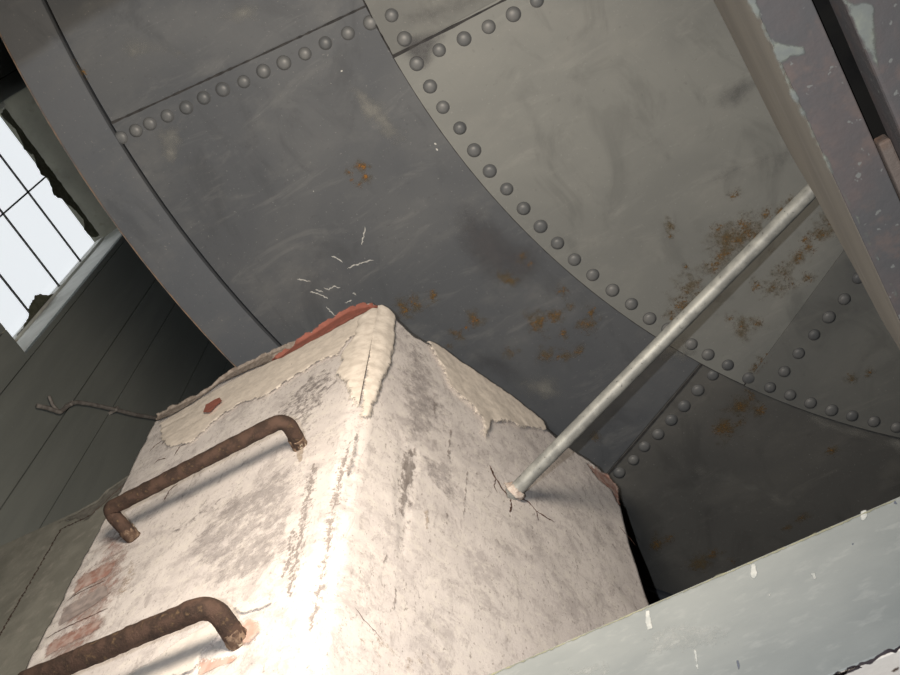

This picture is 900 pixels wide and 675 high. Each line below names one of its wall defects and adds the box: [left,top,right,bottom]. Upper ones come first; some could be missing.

peeling [748,0,813,136]
peeling [844,0,877,63]
peeling [428,341,546,436]
crack [489,465,554,522]
peeling [491,500,895,675]